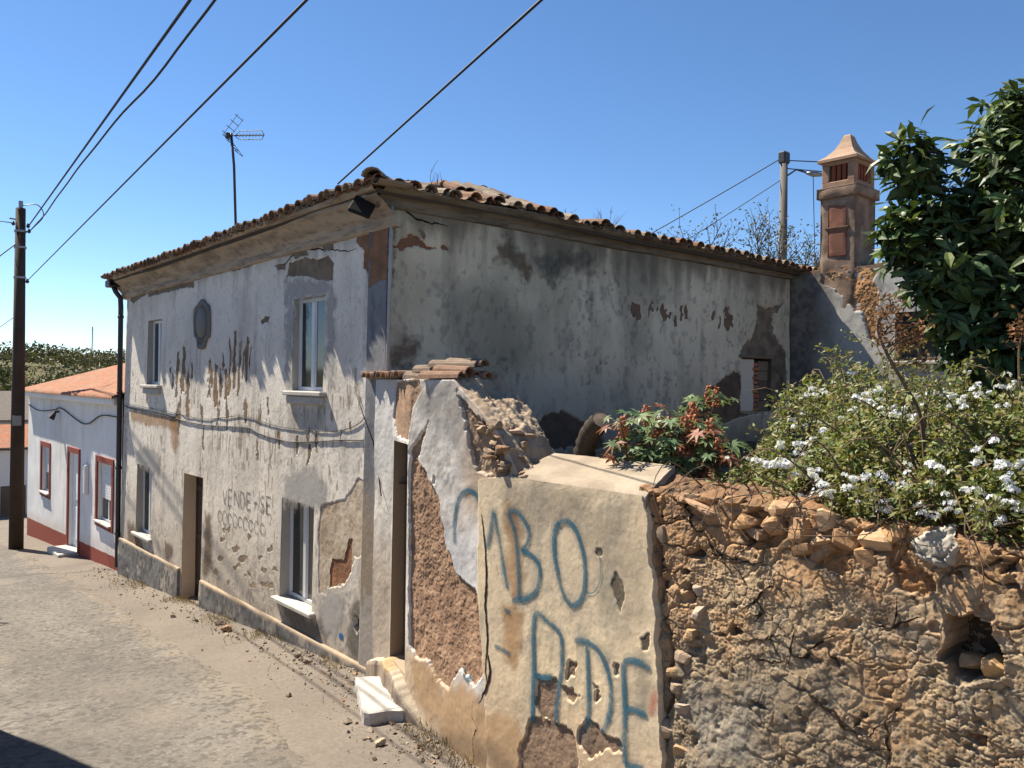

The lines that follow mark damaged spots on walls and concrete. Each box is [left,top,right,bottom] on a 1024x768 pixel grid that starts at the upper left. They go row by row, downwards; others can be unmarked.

peeling [275,244,334,281]
crack [274,248,356,267]
flaking render [357,228,448,290]
crack [405,211,448,227]
flaking render [674,303,787,424]
flaking render [461,397,510,477]
flaking render [319,478,363,594]
flaking render [395,378,483,688]
spalling [612,572,625,612]
crack [651,481,902,768]
crack [875,598,921,630]
flaking render [520,661,622,768]